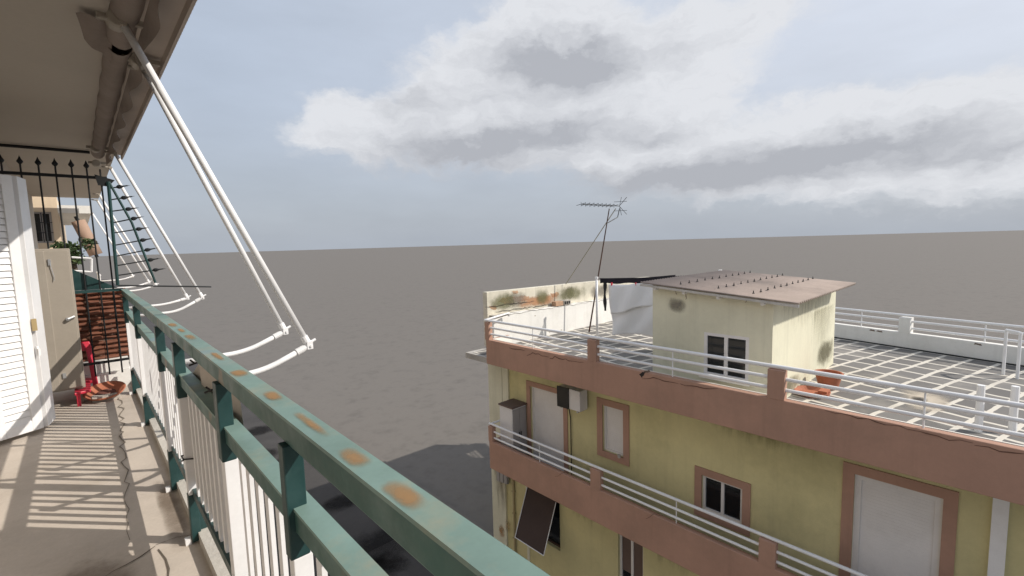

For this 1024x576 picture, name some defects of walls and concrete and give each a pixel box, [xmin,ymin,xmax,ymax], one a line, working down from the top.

damp [494,288,580,308]
damp [819,337,1024,367]
crack [647,377,718,389]
crack [825,410,1023,454]
corrosion [391,486,418,504]